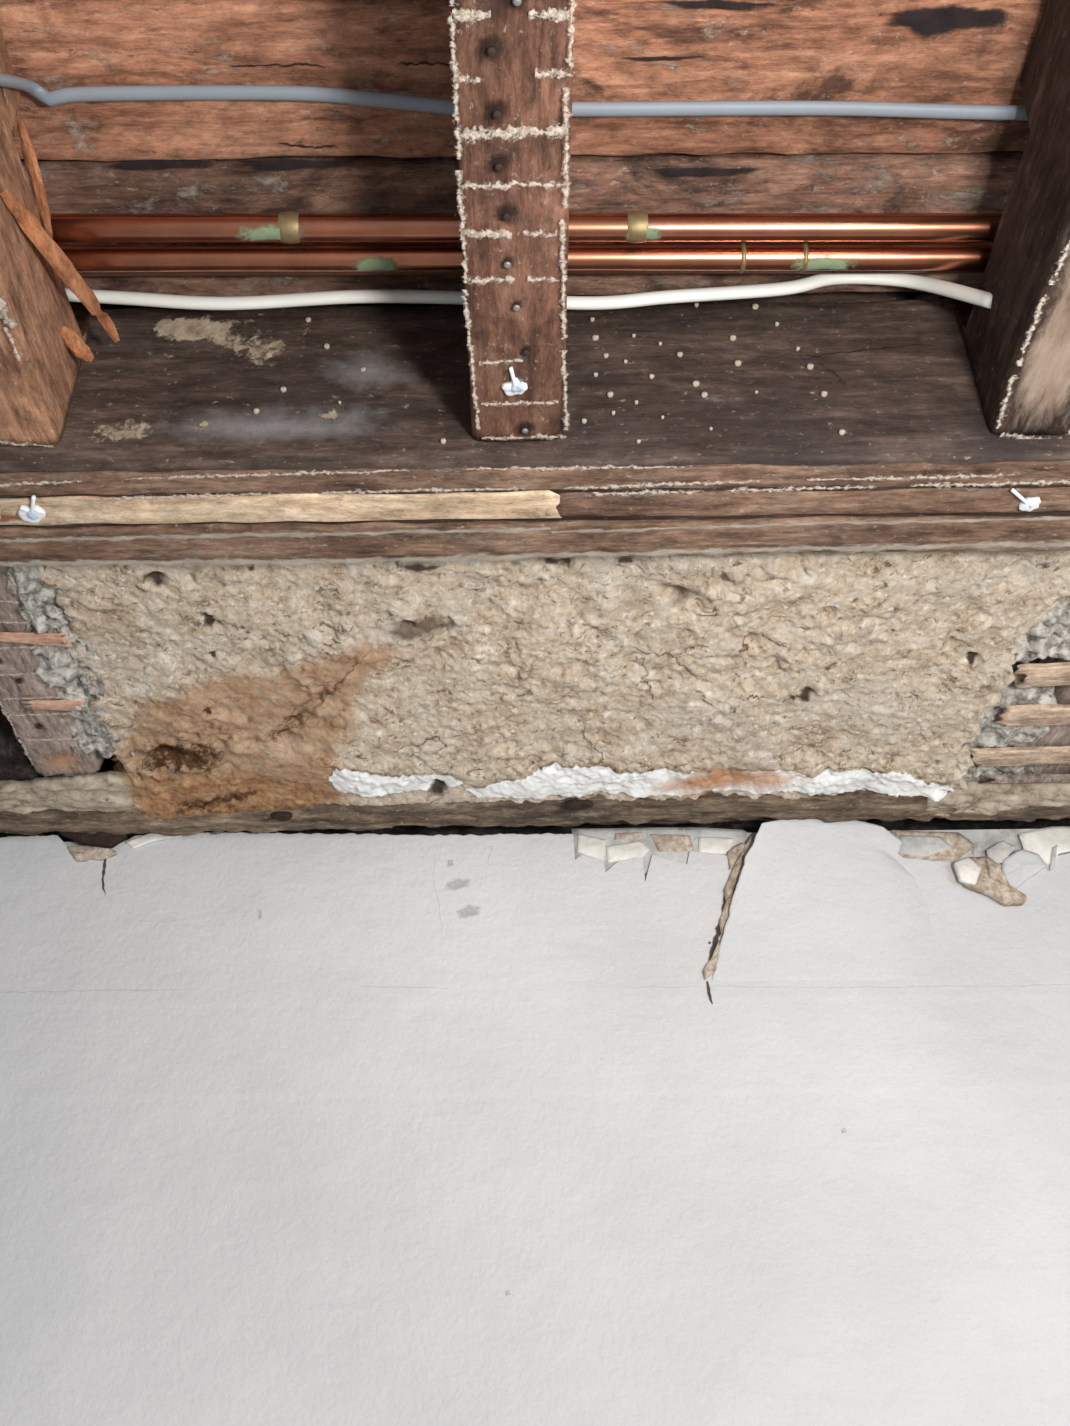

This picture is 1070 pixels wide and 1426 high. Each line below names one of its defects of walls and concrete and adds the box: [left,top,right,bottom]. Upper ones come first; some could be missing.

damp [269,680,343,739]
damp [136,743,338,820]
flaking render [572,827,748,873]
peeling [891,826,1070,906]
crack [703,835,756,1004]